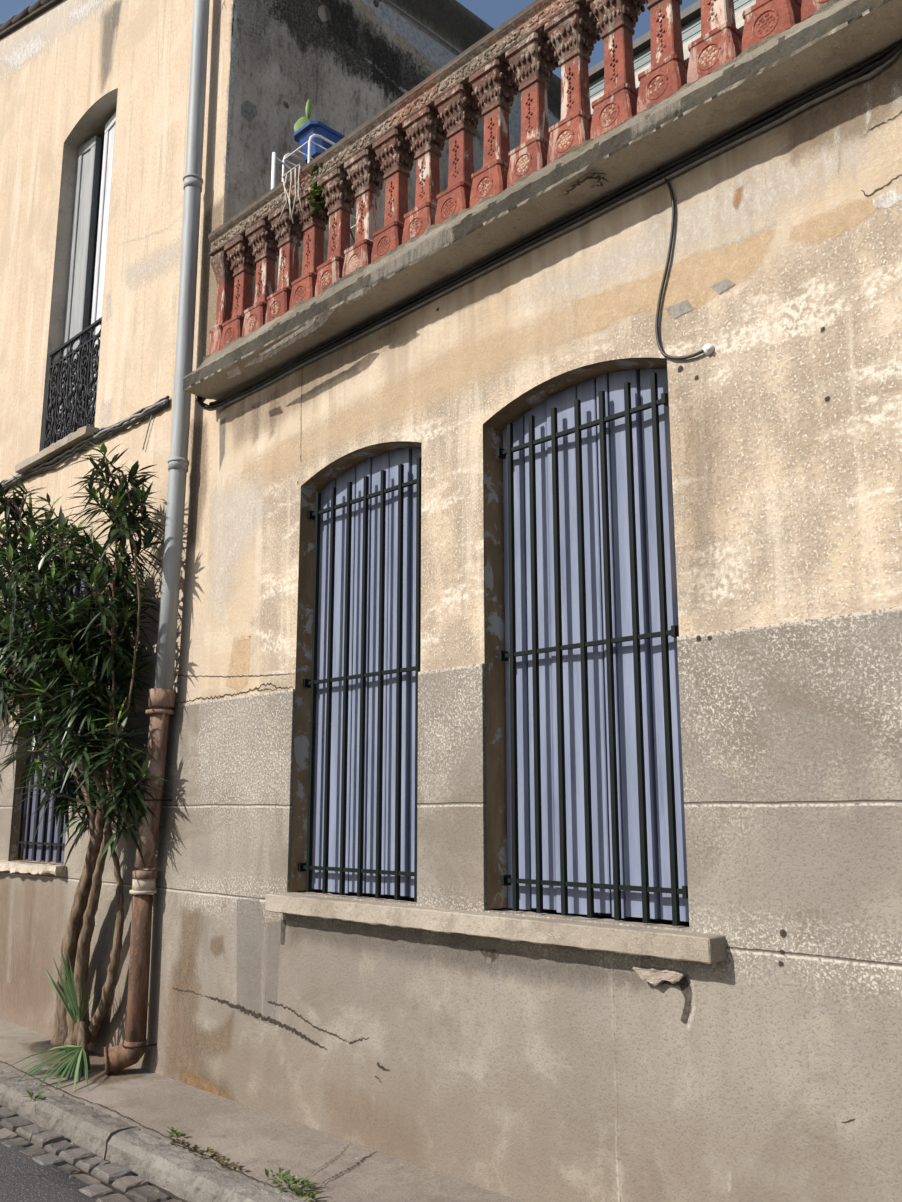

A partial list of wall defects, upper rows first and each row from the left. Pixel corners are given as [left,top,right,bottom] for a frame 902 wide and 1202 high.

water stain [264,0,430,101]
peeling [793,189,902,242]
crack [861,174,902,197]
peeling [574,225,772,336]
crack [172,988,390,1082]
flaking render [632,966,694,1028]